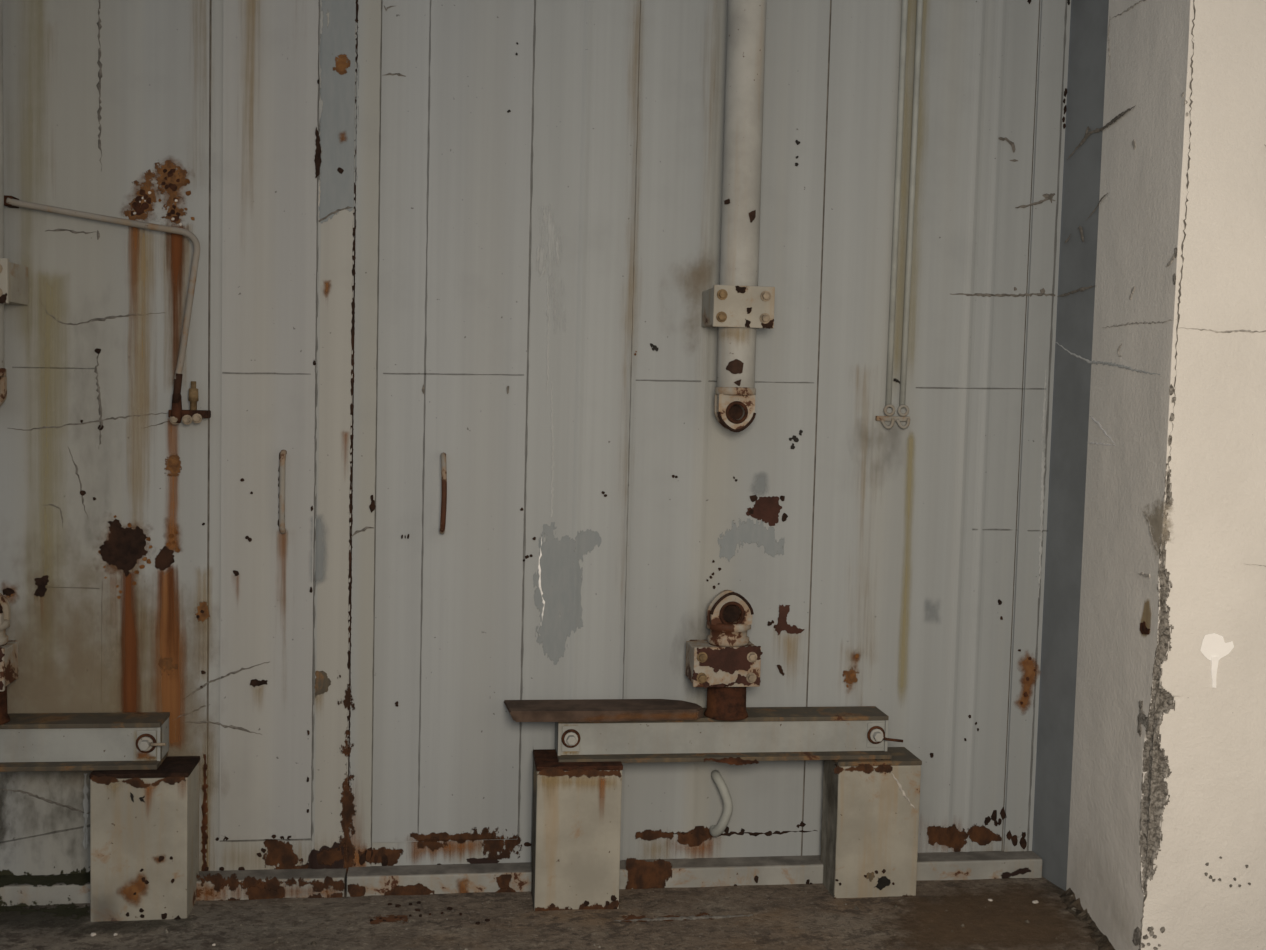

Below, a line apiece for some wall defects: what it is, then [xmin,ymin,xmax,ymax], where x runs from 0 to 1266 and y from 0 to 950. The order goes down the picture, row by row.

corrosion [124,160,195,410]
corrosion [164,420,182,550]
corrosion [196,0,531,901]
peeling [523,381,601,665]
peeling [706,475,788,589]
corrosion [91,775,186,802]
corrosion [136,734,156,760]
corrosion [692,645,763,688]
spalling [1132,461,1175,950]
corrosion [120,869,149,918]
corrosion [369,883,462,924]